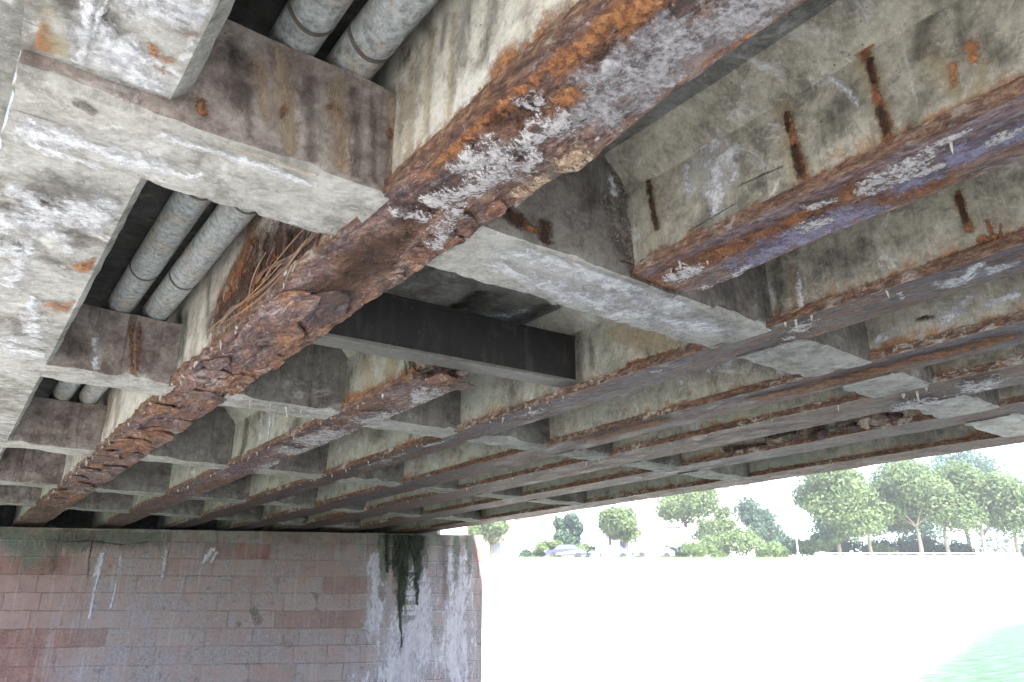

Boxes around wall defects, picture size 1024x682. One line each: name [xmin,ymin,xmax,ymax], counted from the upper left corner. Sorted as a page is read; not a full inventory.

rust [419,0,665,178]
damp [385,0,795,251]
rust [784,111,826,184]
damp [828,76,858,106]
rust [855,44,896,146]
spalling [205,216,322,345]
rust [388,143,604,285]
rust [650,171,1024,286]
rust [188,291,350,412]
damp [88,531,170,619]
damp [201,547,218,564]
damp [353,534,477,682]